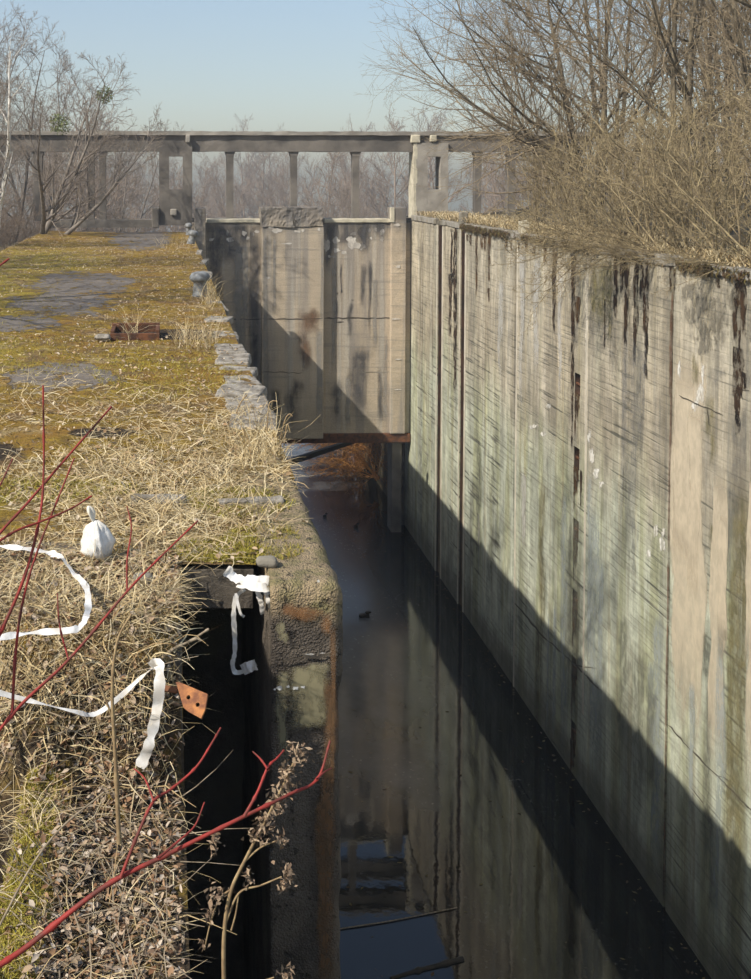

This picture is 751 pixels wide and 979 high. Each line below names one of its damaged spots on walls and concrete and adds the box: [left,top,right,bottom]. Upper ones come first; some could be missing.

water stain [334,353,366,420]